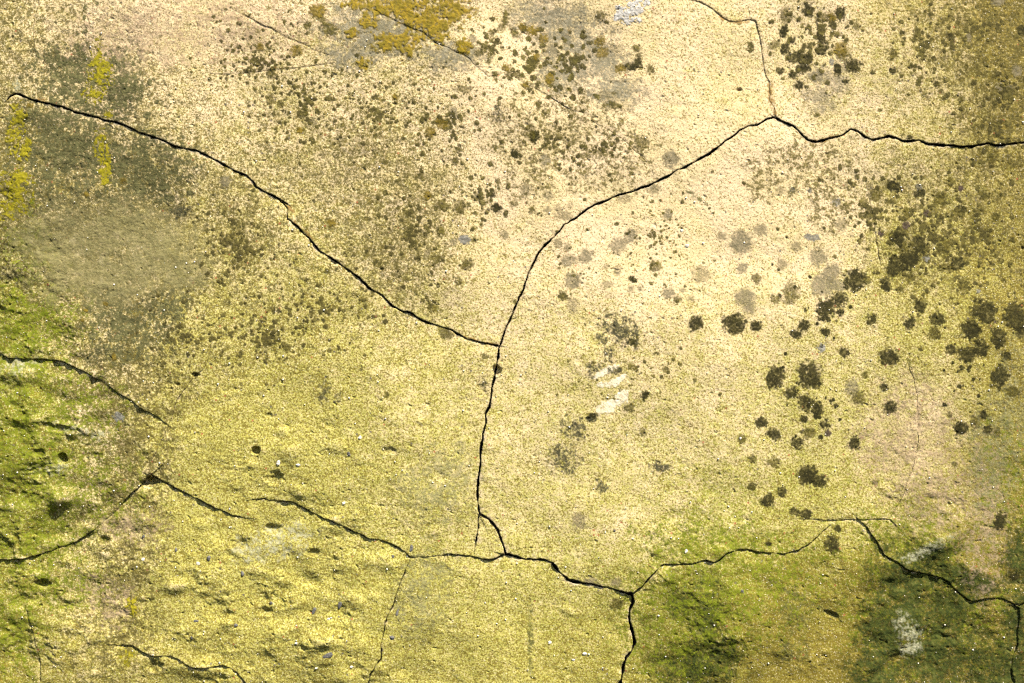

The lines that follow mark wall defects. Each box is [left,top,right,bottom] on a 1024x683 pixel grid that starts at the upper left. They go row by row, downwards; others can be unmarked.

crack [215,10,335,74]
mould [769,0,865,94]
mould [890,2,1021,115]
crack [8,93,285,203]
damp [207,0,687,303]
mould [838,63,1024,338]
crack [119,348,240,517]
damp [64,167,388,681]
crack [252,104,1024,683]
mould [796,368,842,426]
damp [648,578,746,683]
damp [844,528,1024,683]